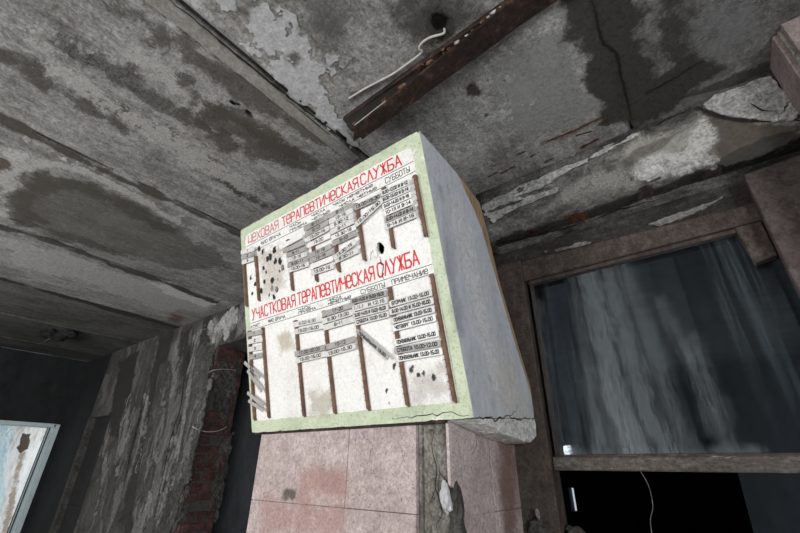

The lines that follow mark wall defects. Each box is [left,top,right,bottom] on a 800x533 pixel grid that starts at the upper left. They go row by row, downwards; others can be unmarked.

leakage [0,0,333,209]
peeling [216,0,359,148]
rust [466,83,481,96]
rust [546,116,605,148]
leakage [498,0,772,139]
spalling [481,76,798,227]
crack [592,1,705,120]
leakage [0,113,245,437]
peeling [94,393,150,517]
leakage [117,437,145,533]
peeling [139,306,239,533]
spalling [439,453,467,533]